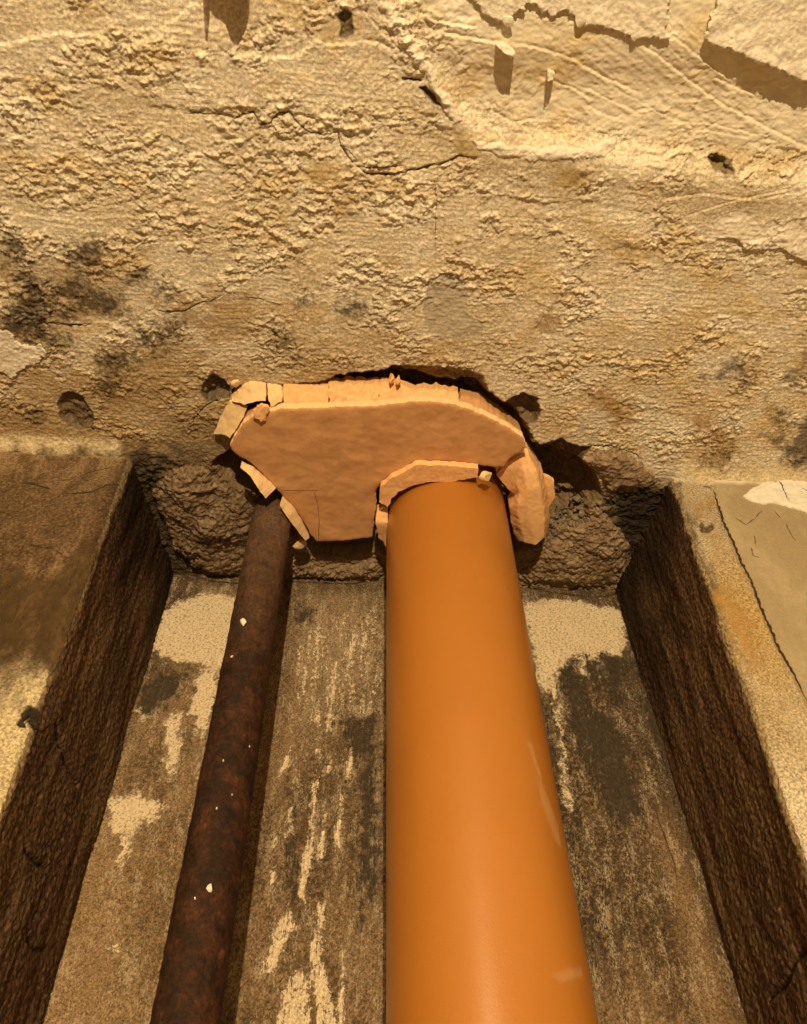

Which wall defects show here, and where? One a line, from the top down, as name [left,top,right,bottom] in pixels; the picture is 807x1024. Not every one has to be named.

peeling [496,40,515,59]
peeling [473,0,671,43]
peeling [704,0,807,82]
crack [189,111,472,240]
water stain [2,232,123,349]
spalling [57,391,94,430]
spalling [201,374,241,402]
spalling [501,392,541,424]
spalling [545,438,591,459]
peeling [479,471,492,482]
water stain [133,592,235,783]
water stain [523,598,673,840]